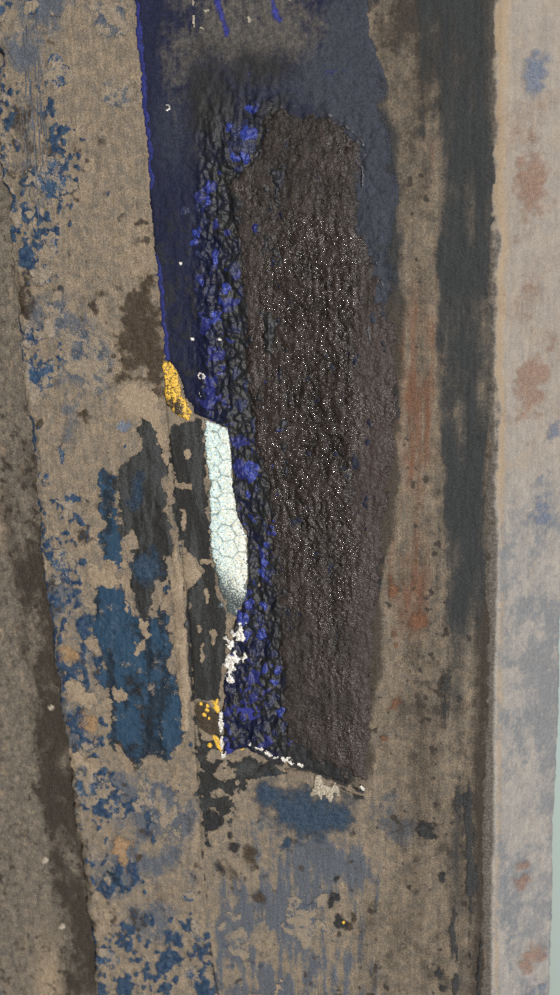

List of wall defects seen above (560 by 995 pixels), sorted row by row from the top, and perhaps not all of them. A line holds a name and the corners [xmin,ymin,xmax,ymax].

peeling [23,0,54,15]
peeling [9,154,192,465]
peeling [165,480,192,531]
peeling [88,552,130,613]
peeling [84,637,98,651]
peeling [133,618,152,656]
peeling [65,679,128,709]
peeling [68,739,186,840]
water stain [462,784,479,914]
peeling [95,947,120,970]
peeling [217,904,250,961]
peeling [281,893,331,950]